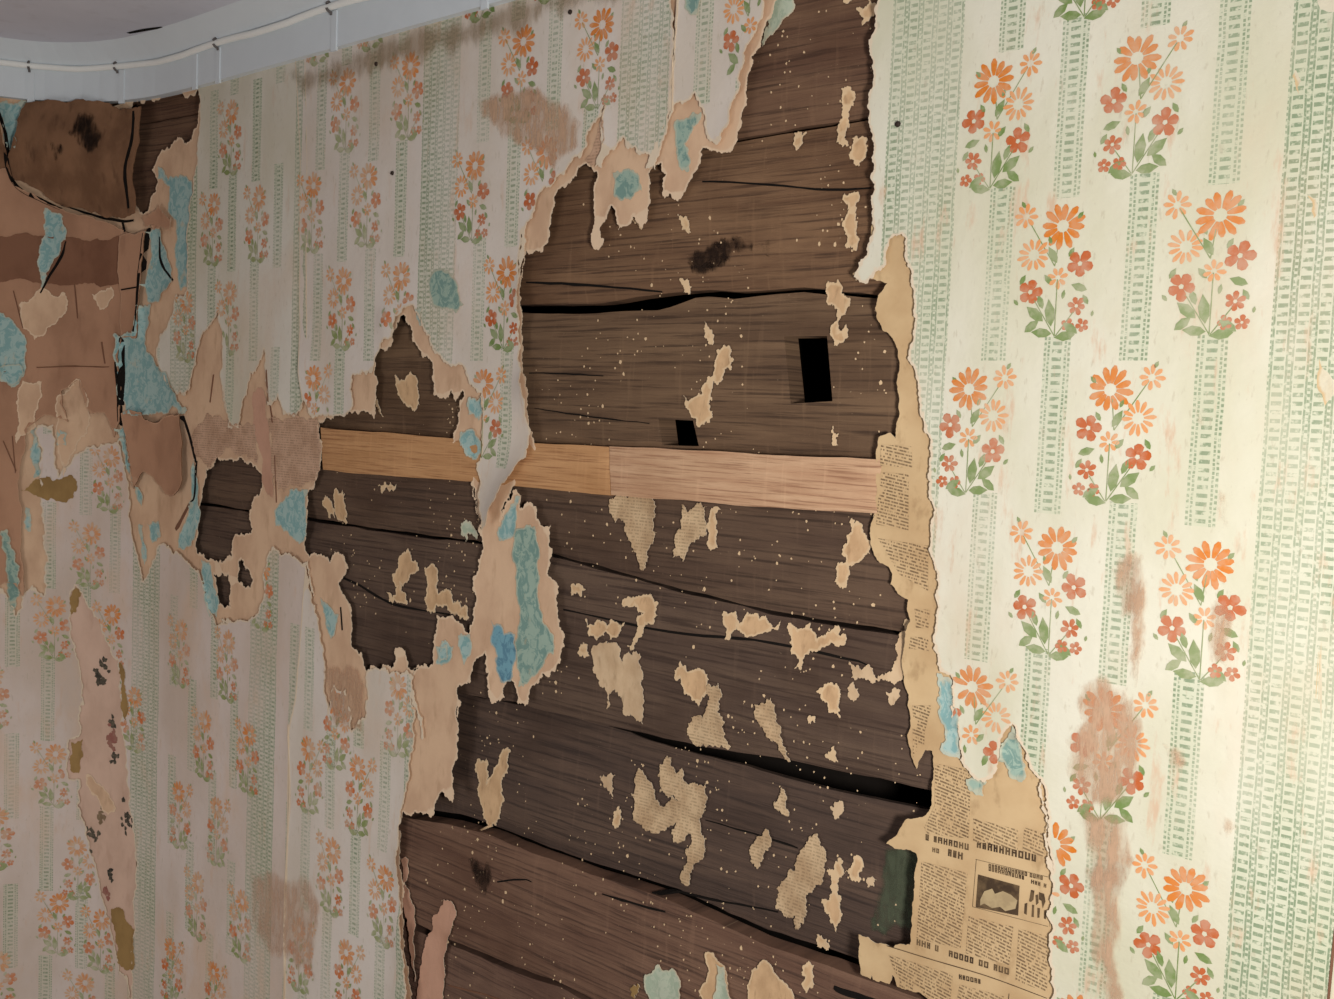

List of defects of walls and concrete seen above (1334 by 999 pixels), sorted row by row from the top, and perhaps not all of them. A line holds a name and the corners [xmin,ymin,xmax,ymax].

crack [526,282,662,293]